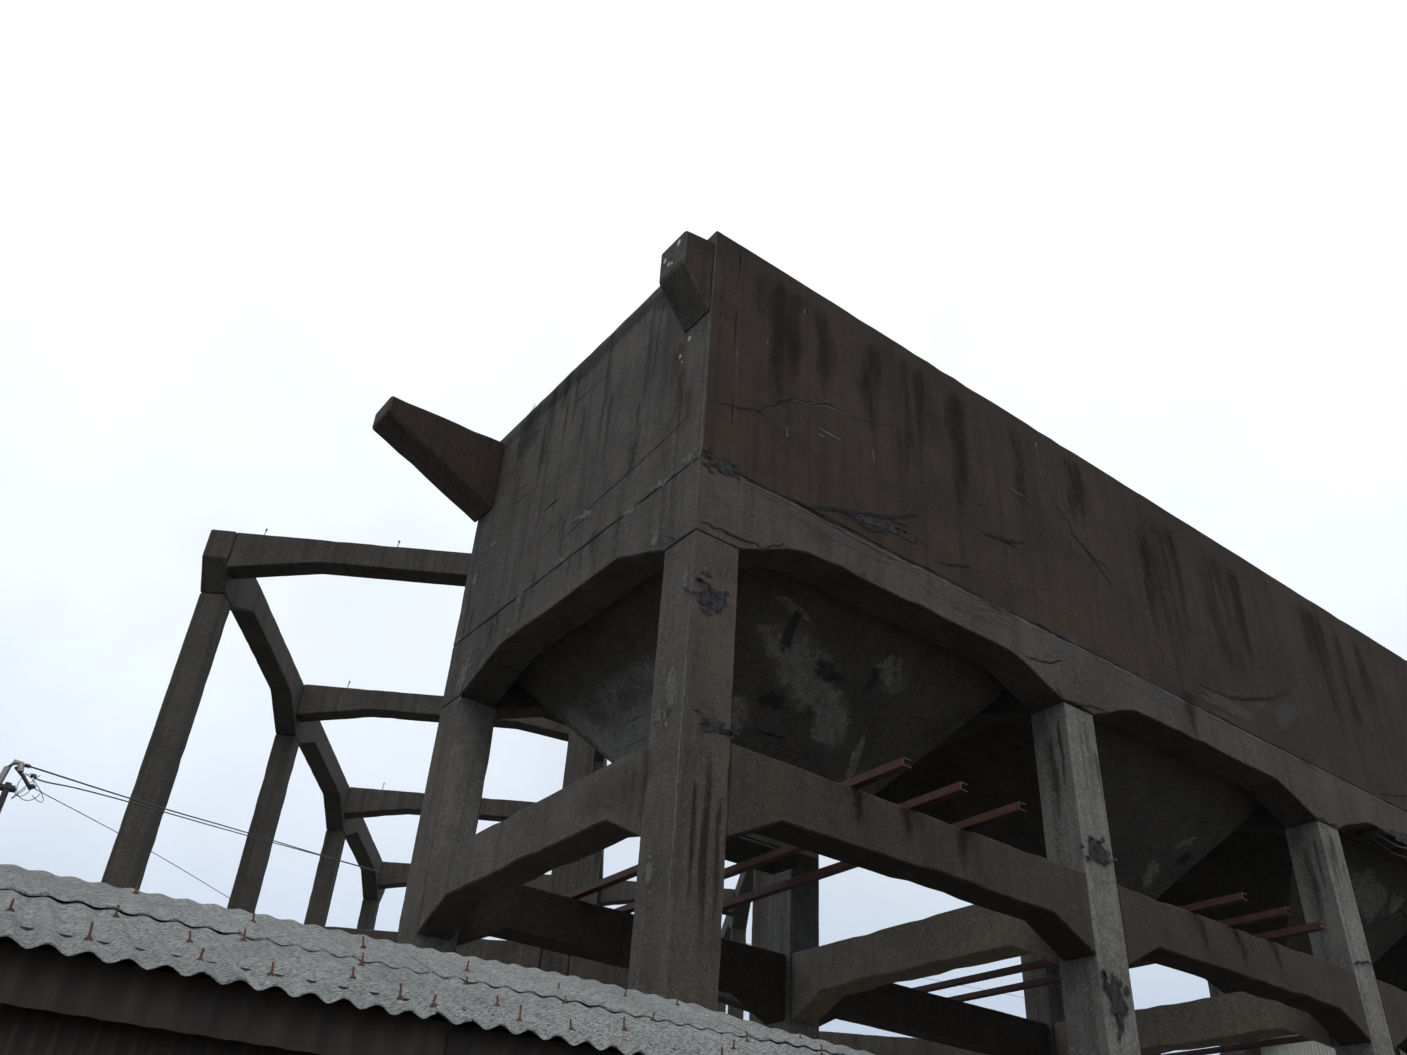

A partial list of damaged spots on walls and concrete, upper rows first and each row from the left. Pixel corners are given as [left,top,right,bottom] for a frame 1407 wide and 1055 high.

spalling [681,571,729,616]
peeling [757,596,865,779]
peeling [693,694,750,739]